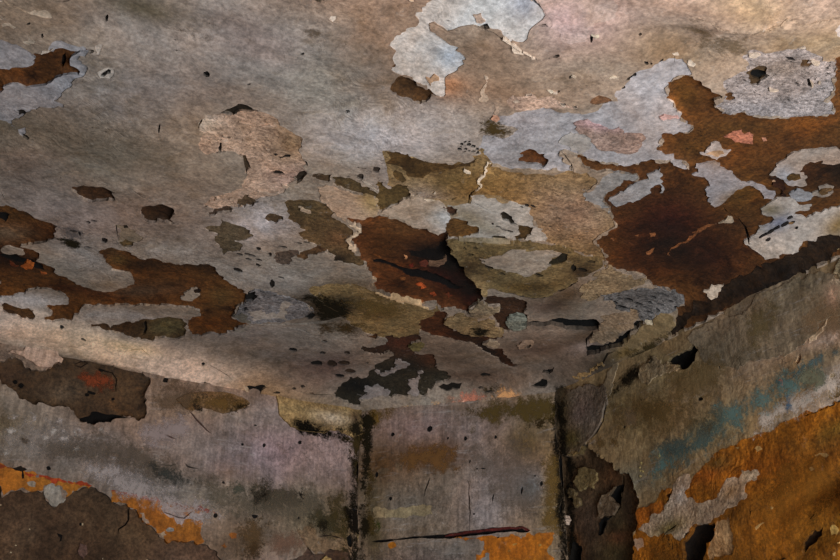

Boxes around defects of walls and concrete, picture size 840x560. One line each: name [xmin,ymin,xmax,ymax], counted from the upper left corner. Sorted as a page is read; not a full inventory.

peeling [0,10,60,29]
peeling [390,0,618,104]
flaking render [0,34,840,407]
flaking render [0,357,151,425]
flaking render [0,475,221,560]
leakage [42,379,391,560]
leakage [463,382,579,560]
flaking render [555,362,760,560]